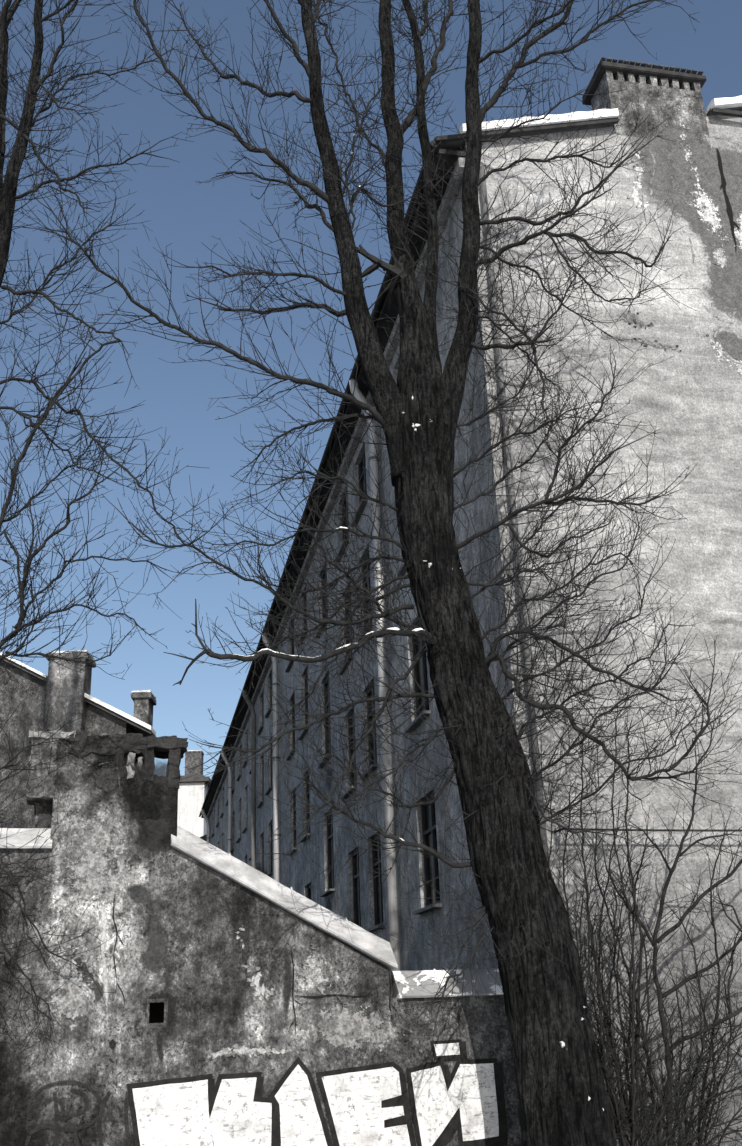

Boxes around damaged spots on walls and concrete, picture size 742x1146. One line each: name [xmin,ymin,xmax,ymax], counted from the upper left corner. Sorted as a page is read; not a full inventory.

leakage [632,124,702,209]
spalling [627,123,742,374]
crack [716,148,740,249]